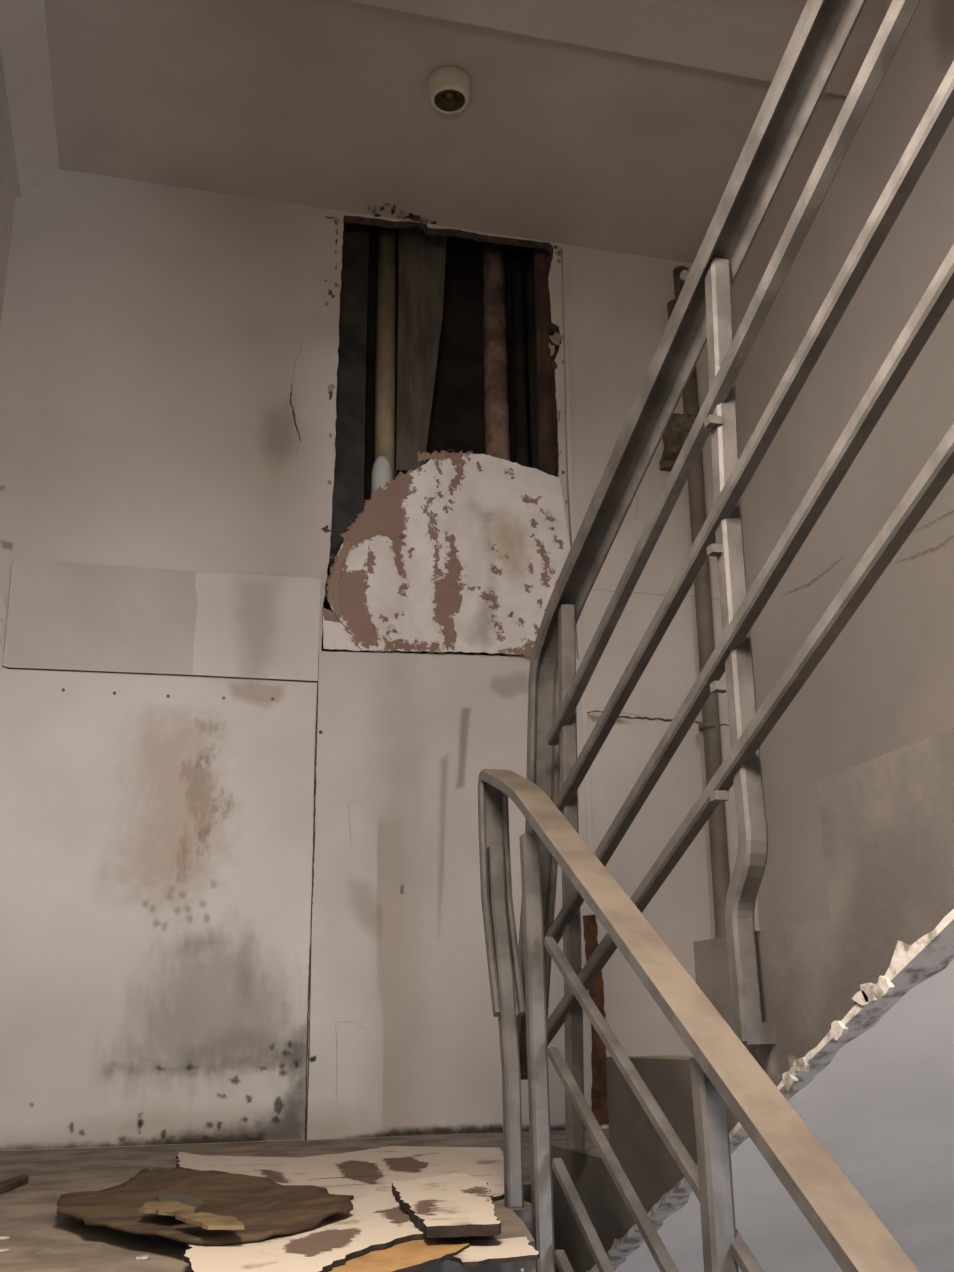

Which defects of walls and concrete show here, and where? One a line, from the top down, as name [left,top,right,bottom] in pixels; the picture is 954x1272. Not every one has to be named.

spalling [549,332,564,369]
peeling [321,448,539,659]
peeling [521,494,564,611]
crack [781,557,844,596]
crack [895,509,954,563]
spalling [777,909,954,1101]
leakage [56,1123,262,1149]
spalling [729,1122,749,1154]
spalling [586,1177,692,1272]